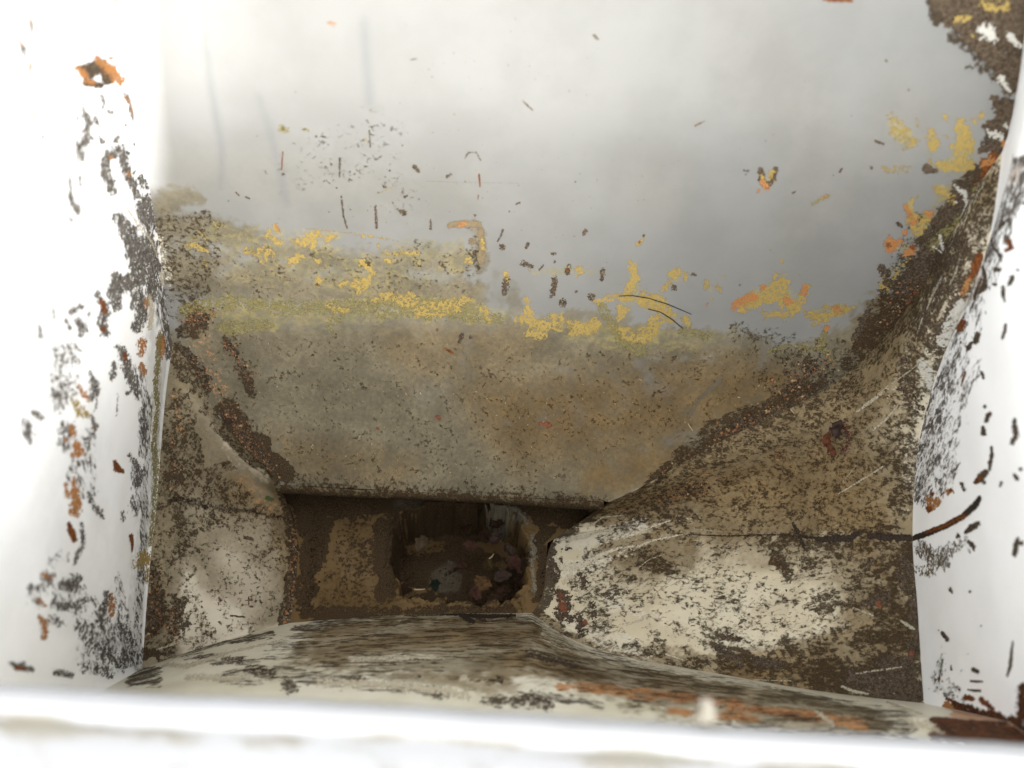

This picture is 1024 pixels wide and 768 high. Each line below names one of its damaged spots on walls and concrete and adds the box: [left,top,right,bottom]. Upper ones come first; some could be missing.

rust [73,54,125,89]
peeling [870,0,1024,413]
peeling [177,158,725,357]
peeling [730,272,871,364]
crack [687,495,982,549]